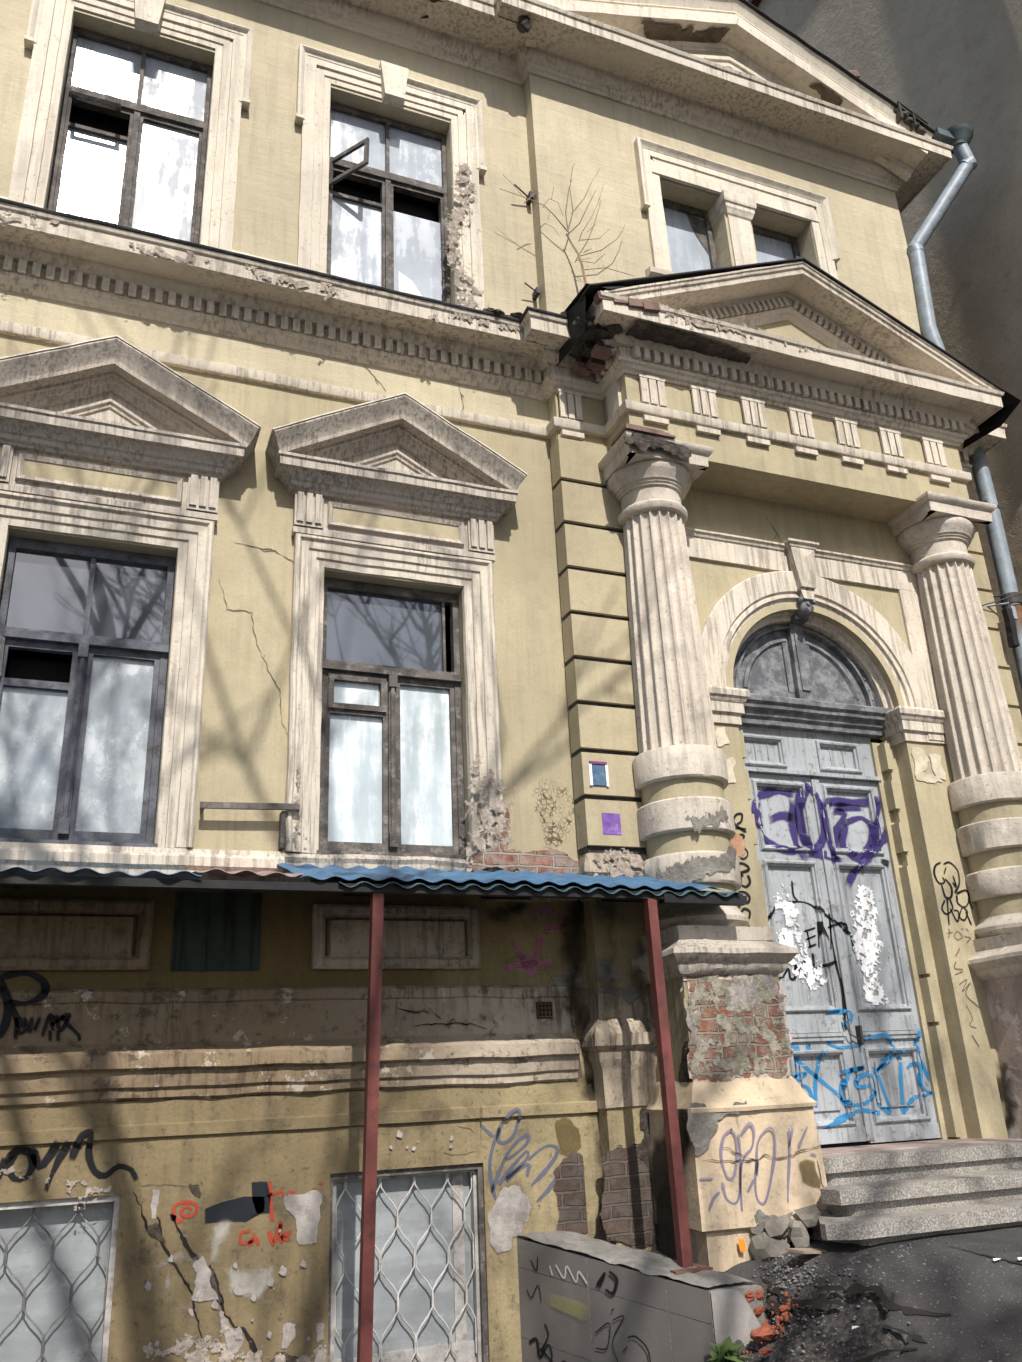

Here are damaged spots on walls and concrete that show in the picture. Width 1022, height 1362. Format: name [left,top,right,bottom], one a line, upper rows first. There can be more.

spalling [641,20,731,43]
spalling [809,83,843,106]
peeling [428,161,536,342]
crack [235,542,293,562]
crack [219,582,286,729]
spalling [460,754,745,890]
spalling [678,973,794,1083]
spalling [0,1166,122,1211]
crack [133,1178,263,1362]
spalling [142,1188,327,1362]
spalling [553,1107,660,1251]
crack [950,1246,1022,1265]